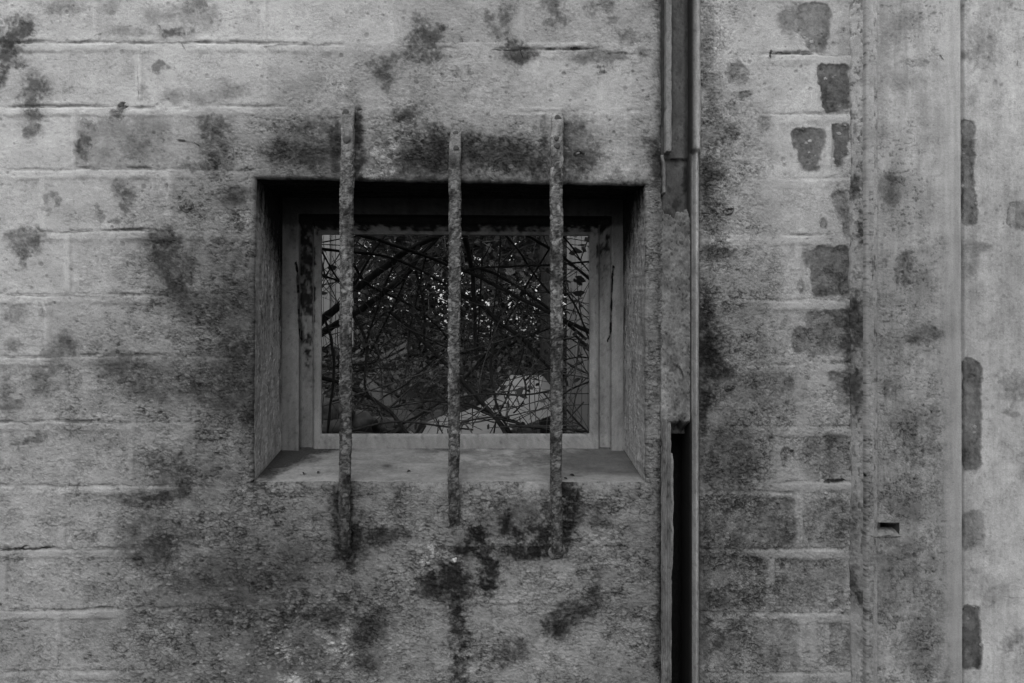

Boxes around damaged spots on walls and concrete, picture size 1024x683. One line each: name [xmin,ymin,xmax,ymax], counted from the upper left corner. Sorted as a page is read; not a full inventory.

water stain [147,0,215,38]
water stain [0,19,48,137]
water stain [75,123,91,158]
water stain [184,115,228,172]
water stain [222,118,341,323]
water stain [324,78,661,273]
water stain [699,158,725,221]
water stain [150,229,251,329]
water stain [299,214,340,366]
water stain [699,296,769,477]
water stain [845,299,863,408]
water stain [541,586,599,640]